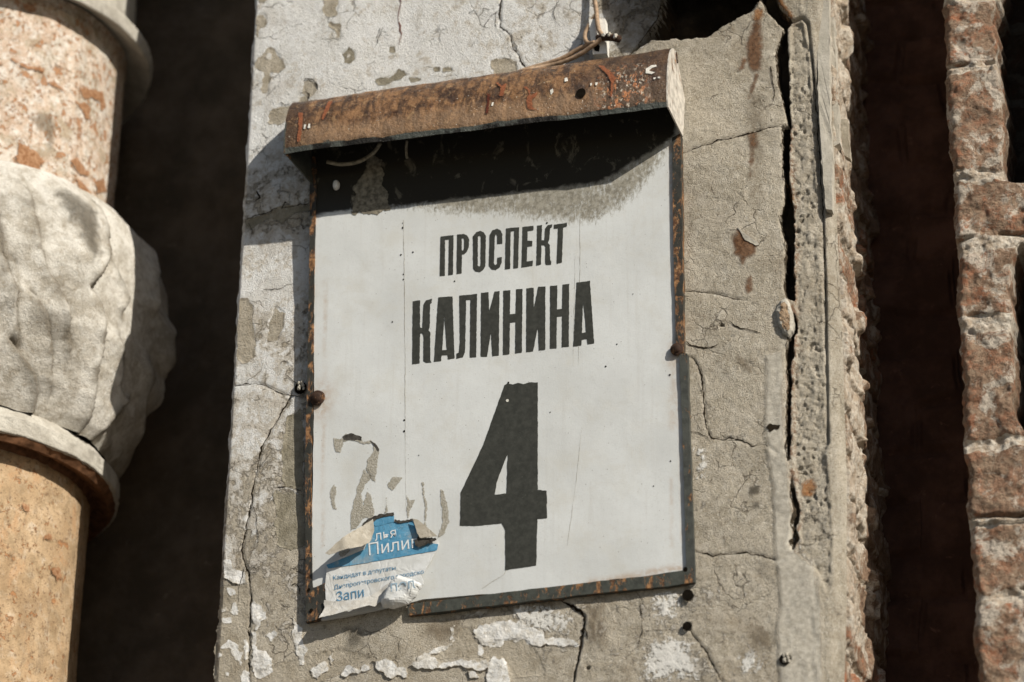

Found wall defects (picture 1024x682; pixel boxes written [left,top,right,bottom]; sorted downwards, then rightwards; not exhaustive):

peeling [256,0,267,37]
peeling [254,47,285,94]
peeling [322,0,355,64]
peeling [375,69,422,86]
crack [484,0,525,67]
rust [739,9,762,93]
rust [733,227,759,263]
crack [683,0,826,560]
crack [236,373,302,680]
peeling [213,559,278,682]
peeling [291,606,579,682]
crack [541,601,588,681]